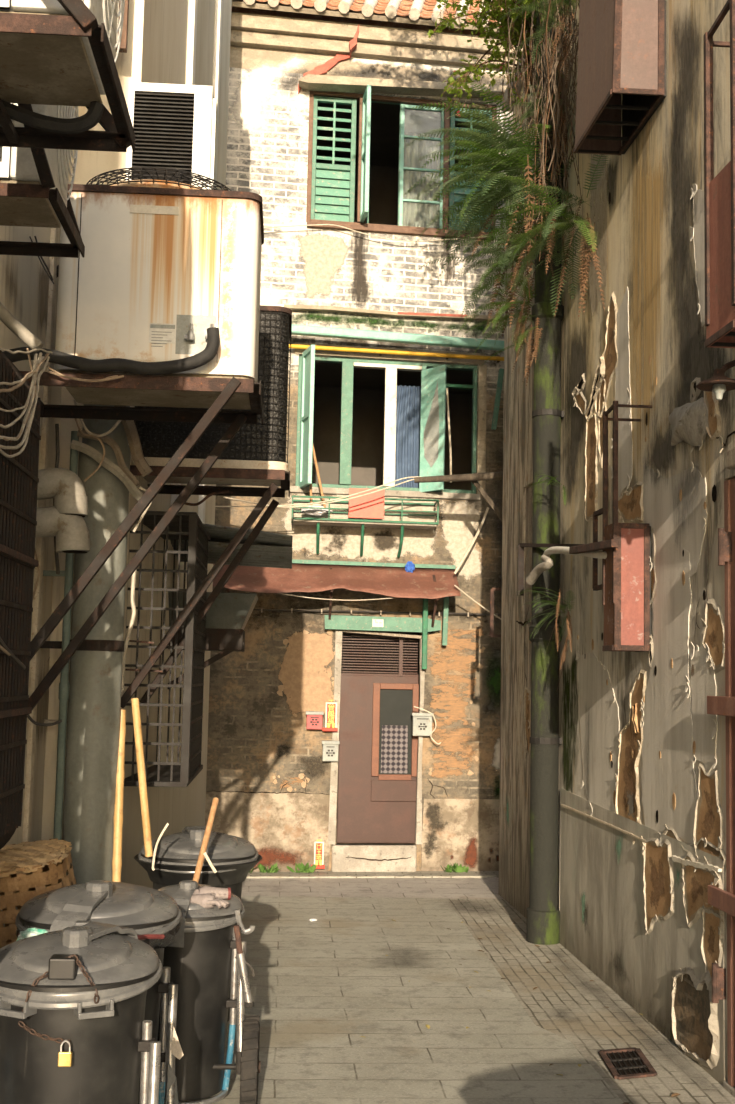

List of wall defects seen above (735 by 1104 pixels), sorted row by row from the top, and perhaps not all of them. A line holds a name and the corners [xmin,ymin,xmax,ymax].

damp [351,231,369,305]
damp [442,237,455,284]
peeling [572,154,726,1069]
peeling [277,629,335,717]
peeling [428,627,486,778]
spalling [606,1051,649,1075]